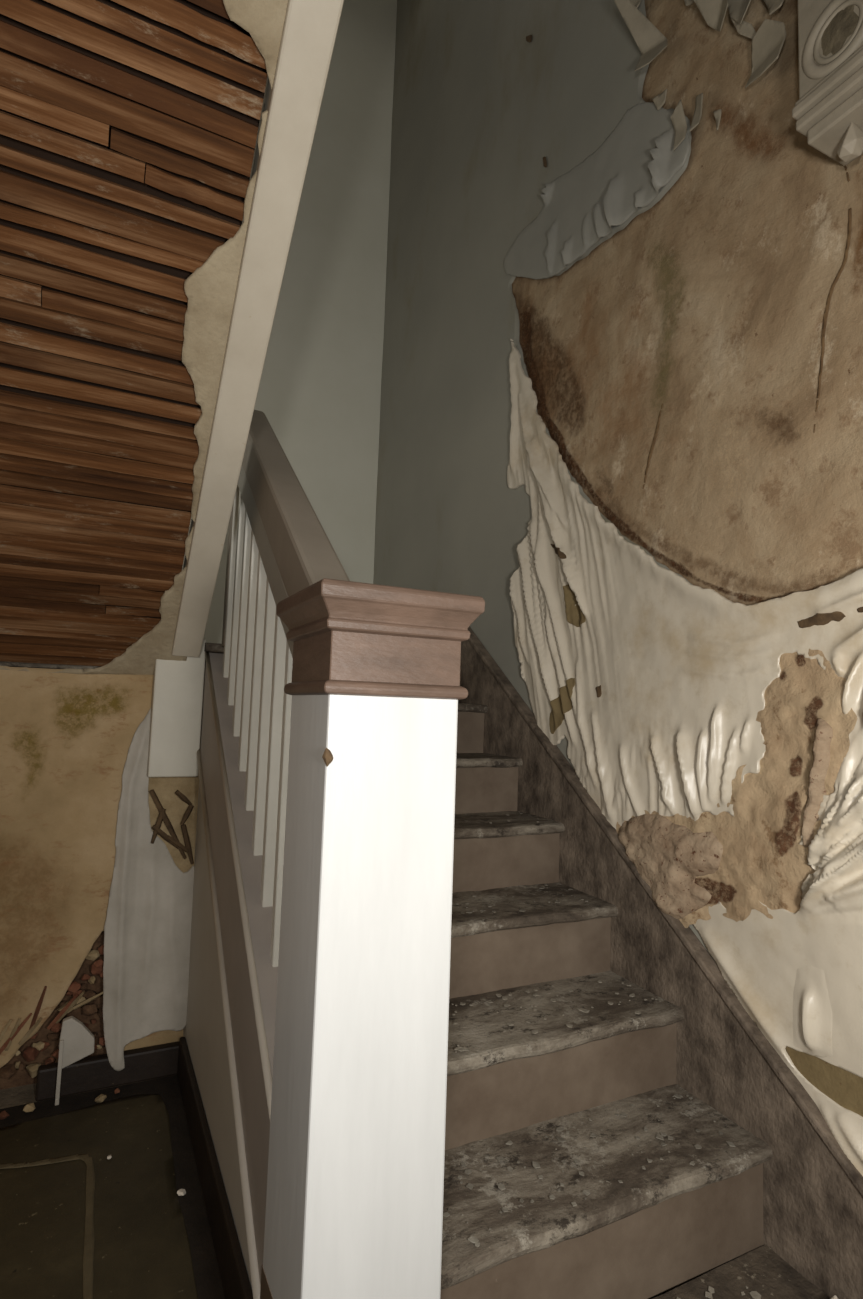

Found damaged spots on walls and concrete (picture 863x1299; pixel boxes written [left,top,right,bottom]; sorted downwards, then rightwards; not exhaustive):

spalling [0,0,268,226]
spalling [0,274,183,324]
spalling [0,250,188,306]
spalling [0,199,193,279]
spalling [0,164,229,242]
crack [814,166,852,433]
spalling [0,317,186,367]
spalling [0,362,201,441]
spalling [504,0,863,1176]
crack [797,607,863,628]
peeling [0,708,199,1079]
peeling [452,982,661,1053]